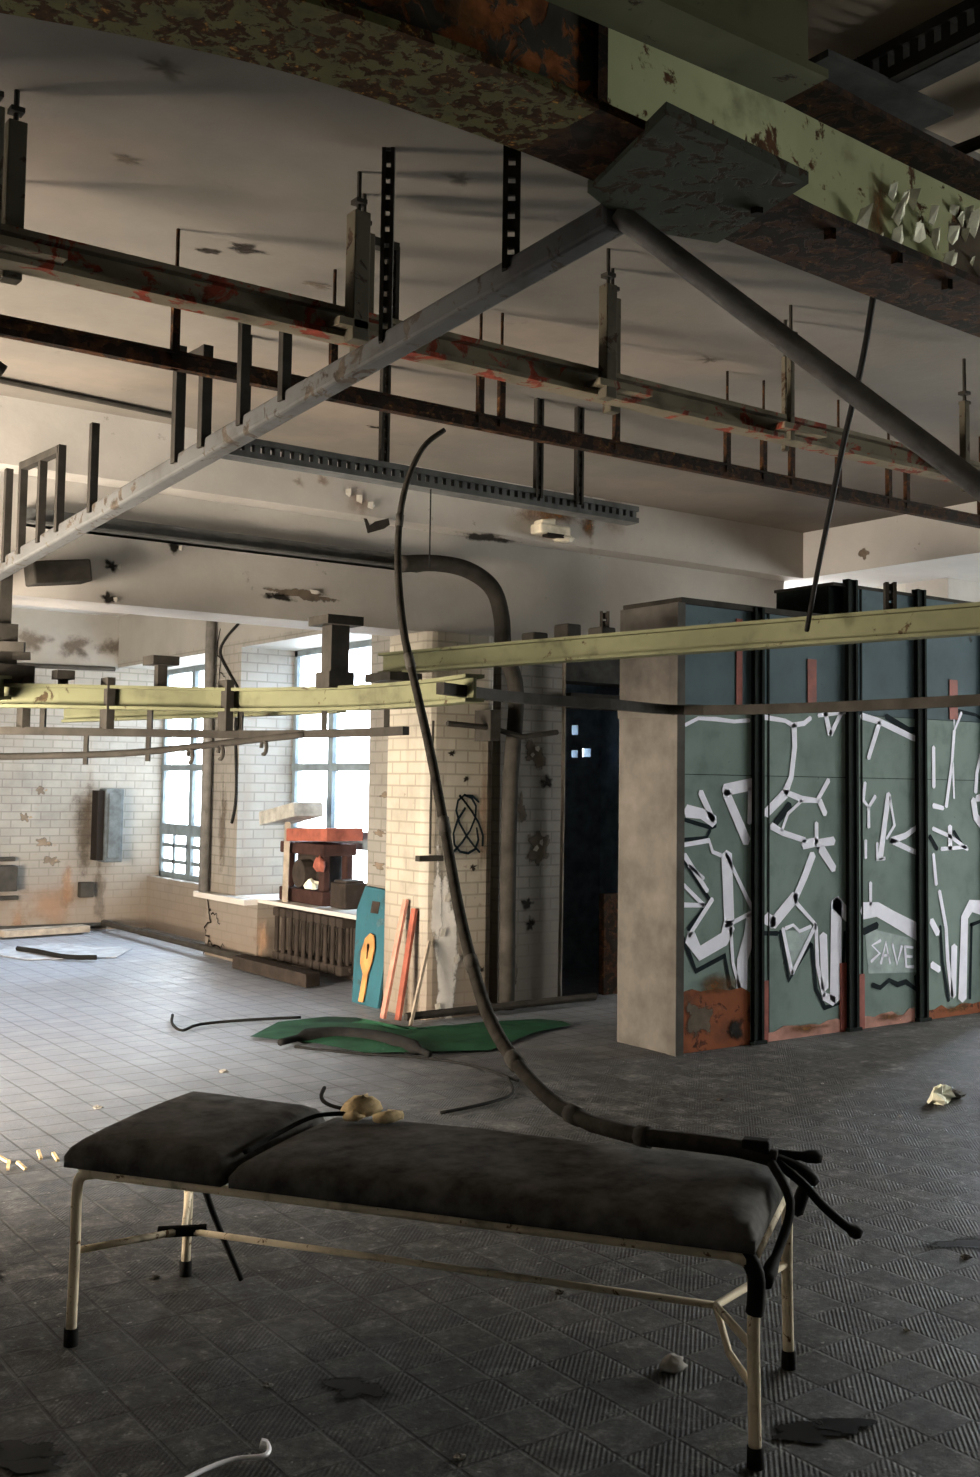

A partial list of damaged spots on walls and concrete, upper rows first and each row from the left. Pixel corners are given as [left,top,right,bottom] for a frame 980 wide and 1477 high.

peeling [856,182,980,278]
corrosion [683,976,750,1054]
corrosion [769,1018,840,1042]
corrosion [865,1002,980,1028]